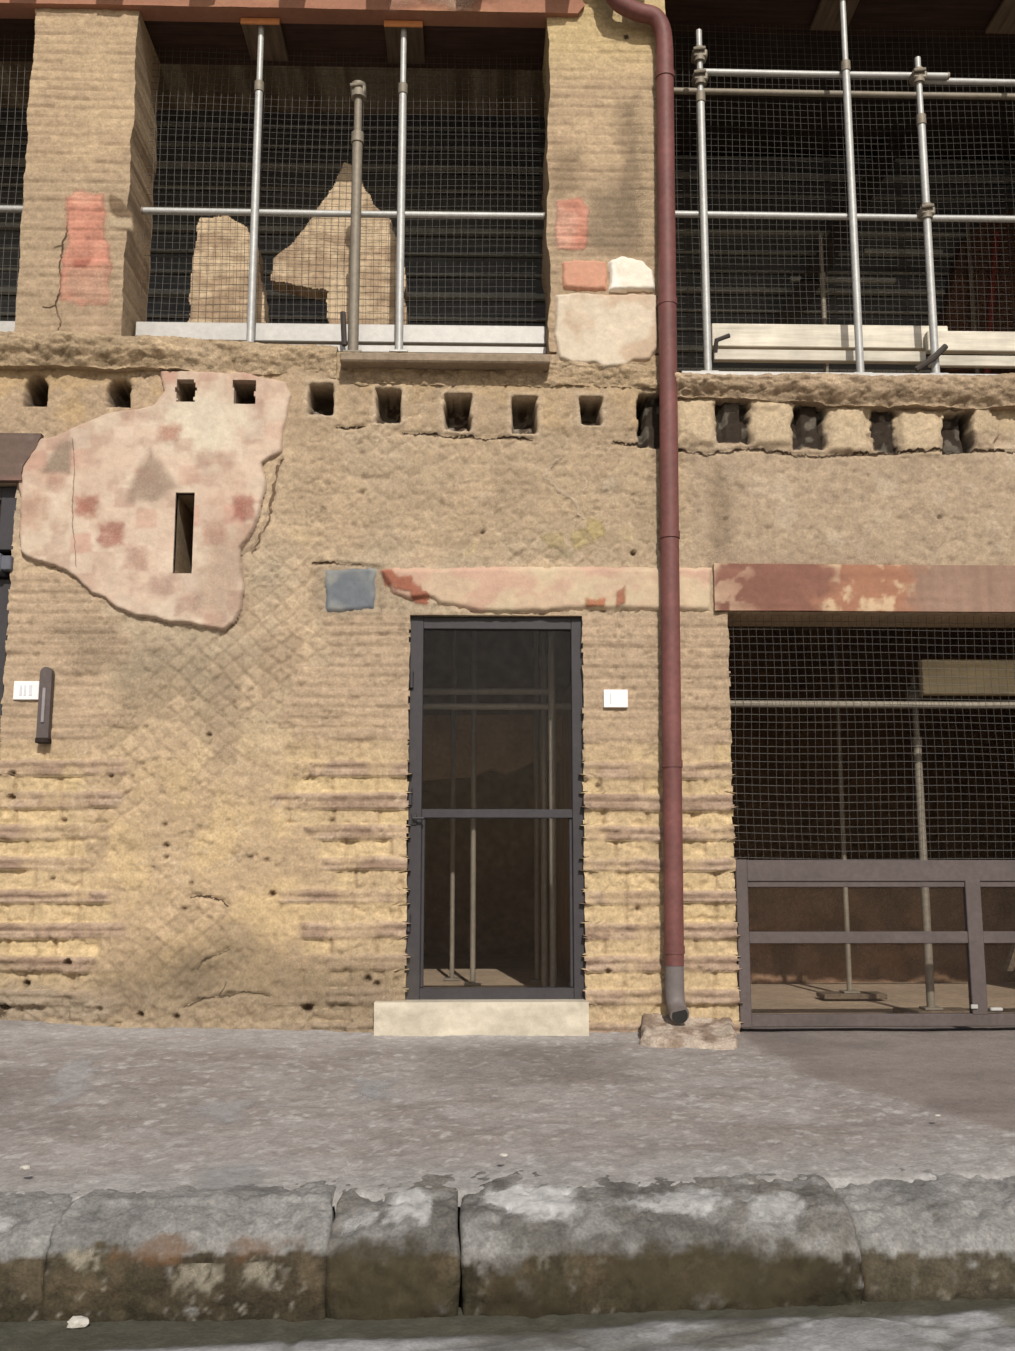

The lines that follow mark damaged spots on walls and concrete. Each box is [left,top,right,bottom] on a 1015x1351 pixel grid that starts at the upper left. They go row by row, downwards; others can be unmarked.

crack [42,223,68,331]
crack [402,432,533,441]
crack [613,440,1015,458]
flaking render [19,371,292,632]
peeling [382,569,429,604]
peeling [586,586,625,607]